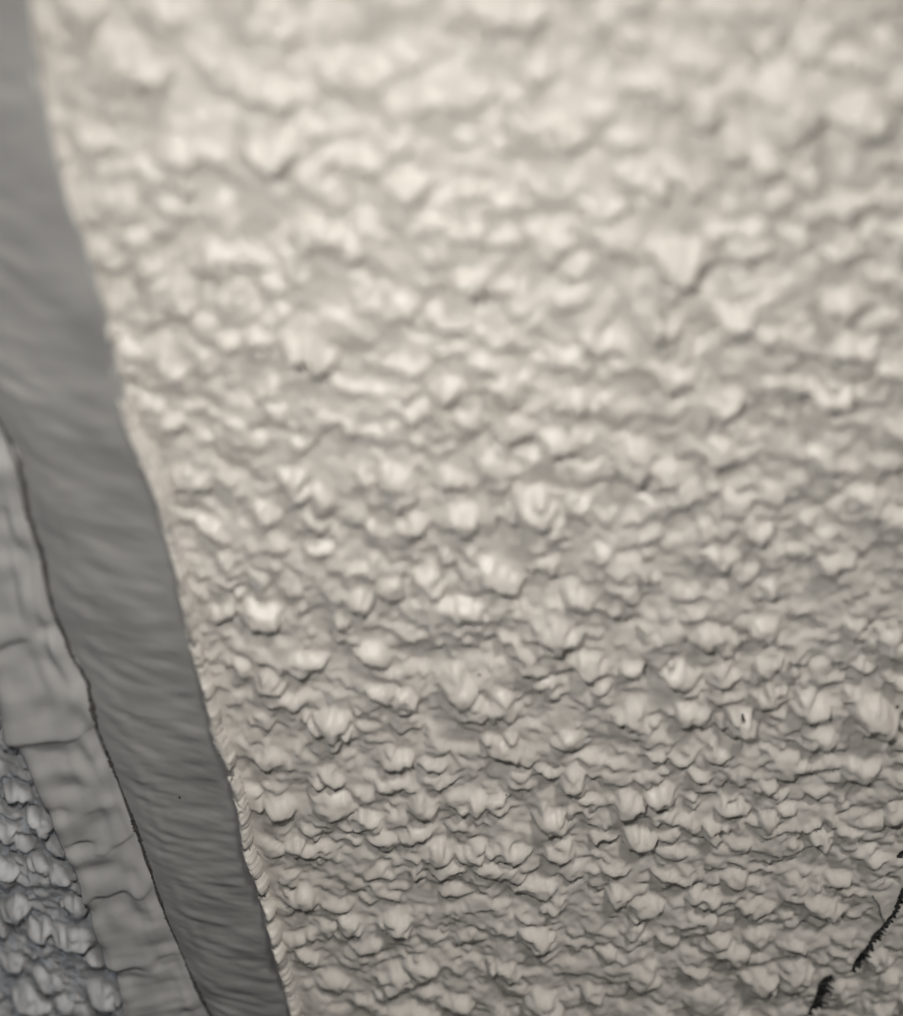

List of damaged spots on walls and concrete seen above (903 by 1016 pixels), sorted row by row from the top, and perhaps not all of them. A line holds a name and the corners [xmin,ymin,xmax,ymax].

crack [805,888,903,1016]